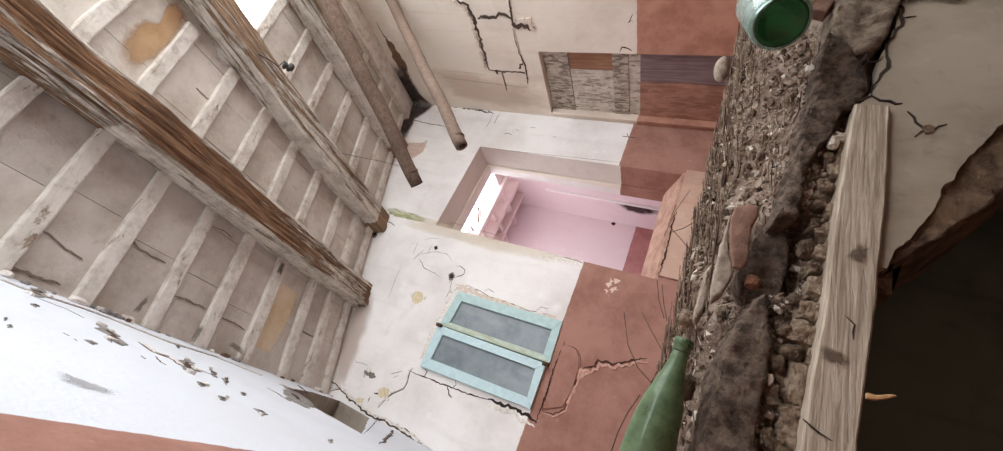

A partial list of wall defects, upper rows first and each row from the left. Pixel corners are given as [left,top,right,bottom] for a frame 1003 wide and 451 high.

leakage [125,4,183,63]
crack [439,0,535,91]
crack [837,4,947,137]
crack [388,222,549,315]
flaking render [84,321,128,346]
flaking render [176,345,246,401]
crack [489,344,648,423]